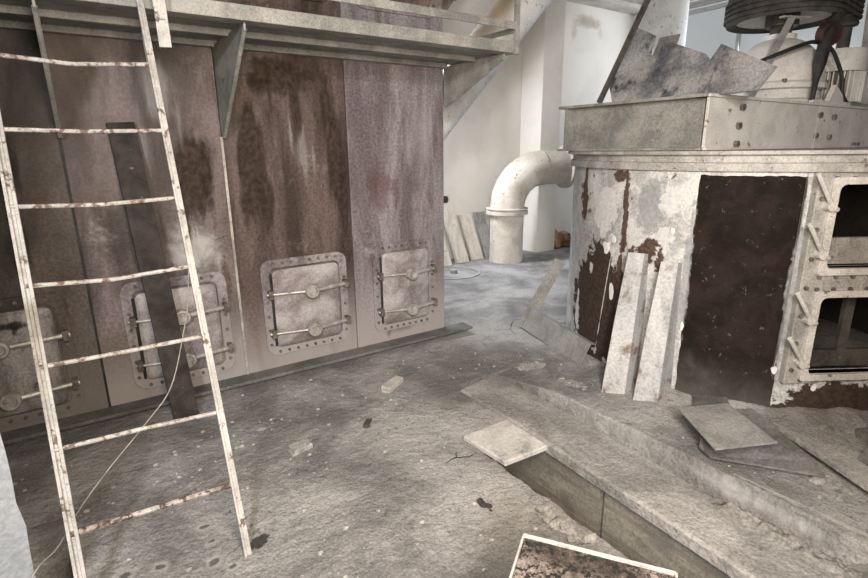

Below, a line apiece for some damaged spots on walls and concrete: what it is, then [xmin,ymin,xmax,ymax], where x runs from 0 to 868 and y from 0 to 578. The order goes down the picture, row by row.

leakage [172,228,222,267]
peeling [573,184,624,362]
peeling [637,172,696,340]